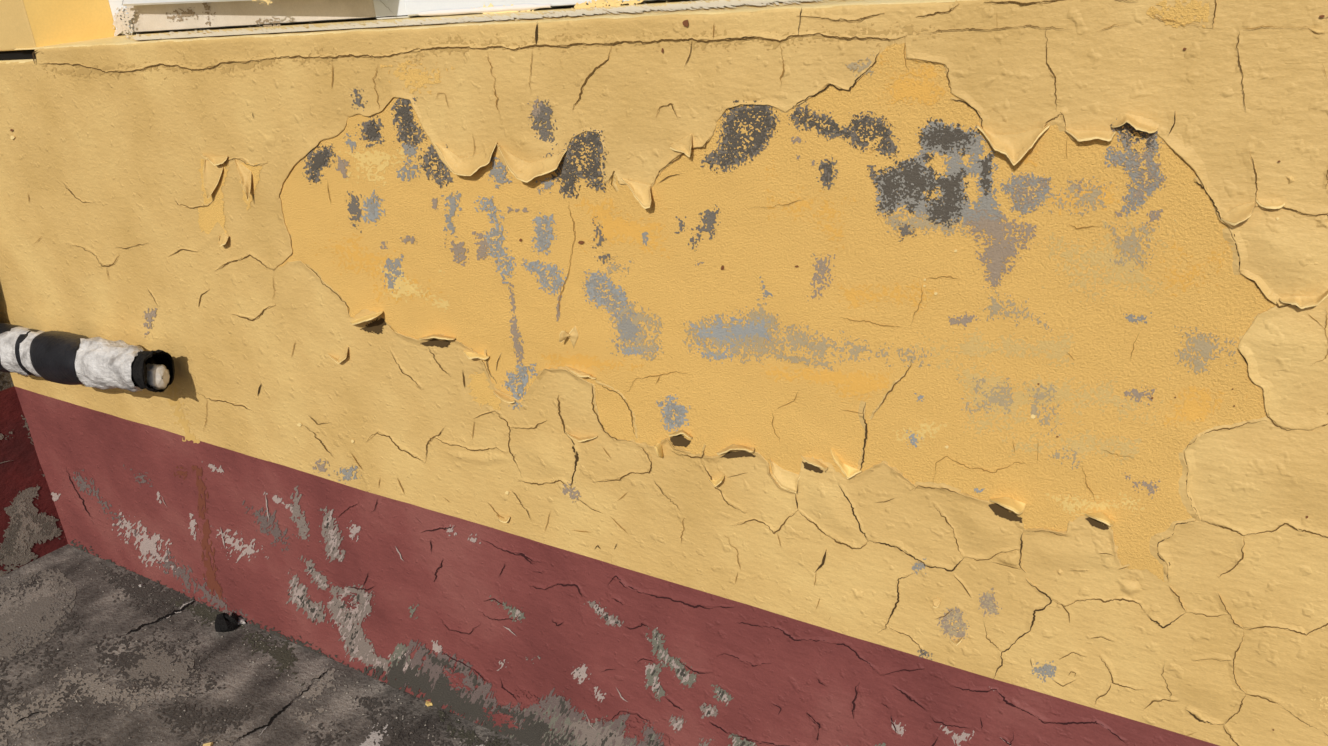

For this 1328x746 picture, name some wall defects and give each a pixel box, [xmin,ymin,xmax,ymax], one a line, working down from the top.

crack [32,0,1327,160]
crack [651,99,717,187]
peeling [198,154,262,246]
crack [33,236,275,321]
crack [306,264,350,317]
crack [557,201,575,314]
peeling [270,42,1328,582]
crack [1194,151,1328,366]
flaking render [0,474,63,577]
flaking render [242,486,734,746]
peeling [933,588,1002,646]
flaking render [1032,660,1056,683]